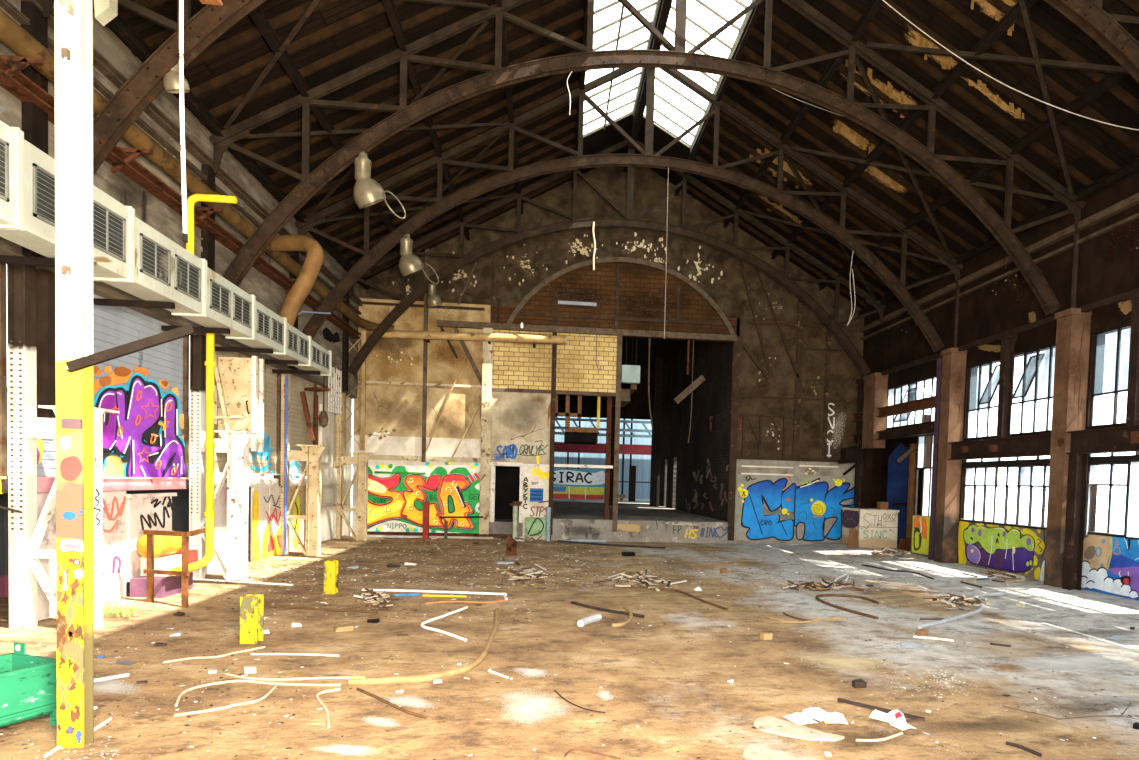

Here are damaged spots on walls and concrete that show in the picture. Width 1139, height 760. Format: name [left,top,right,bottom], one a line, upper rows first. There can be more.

peeling [566,232,723,284]